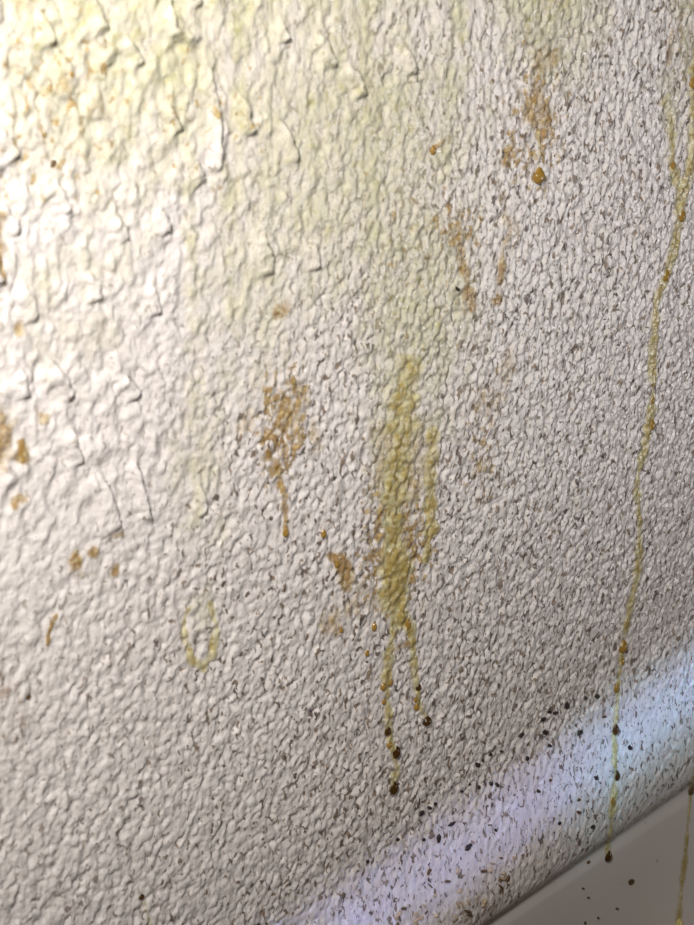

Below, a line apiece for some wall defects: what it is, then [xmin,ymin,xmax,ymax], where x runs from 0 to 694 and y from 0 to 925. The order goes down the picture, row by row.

damp [10,0,215,158]
damp [296,36,413,207]
damp [502,49,565,202]
damp [510,0,585,44]
corrosion [0,413,29,463]
damp [356,188,483,795]
damp [605,60,694,862]
damp [675,773,694,925]